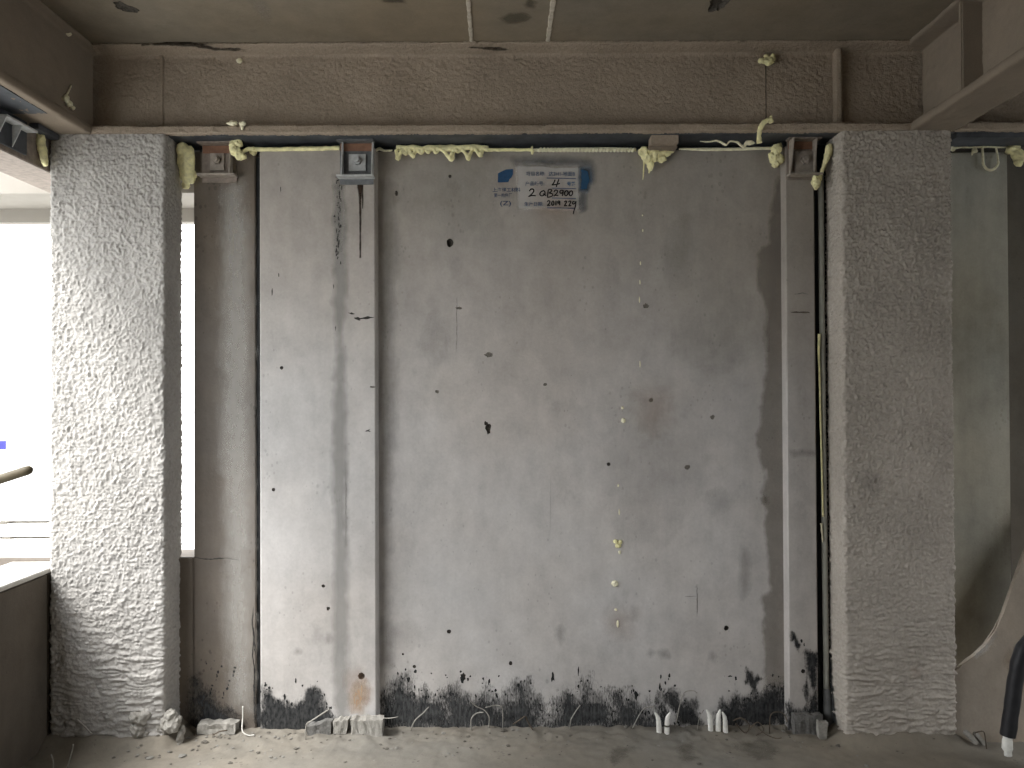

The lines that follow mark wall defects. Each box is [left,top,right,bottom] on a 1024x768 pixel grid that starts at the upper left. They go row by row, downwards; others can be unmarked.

damp [187,665,240,728]
damp [254,678,333,730]
damp [380,631,835,730]